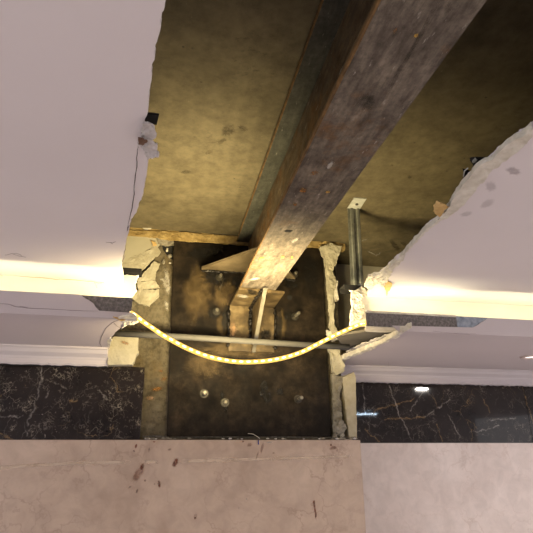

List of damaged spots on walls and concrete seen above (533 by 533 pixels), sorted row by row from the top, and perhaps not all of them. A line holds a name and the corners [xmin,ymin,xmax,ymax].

peeling [107,336,139,367]
spalling [113,122,533,438]